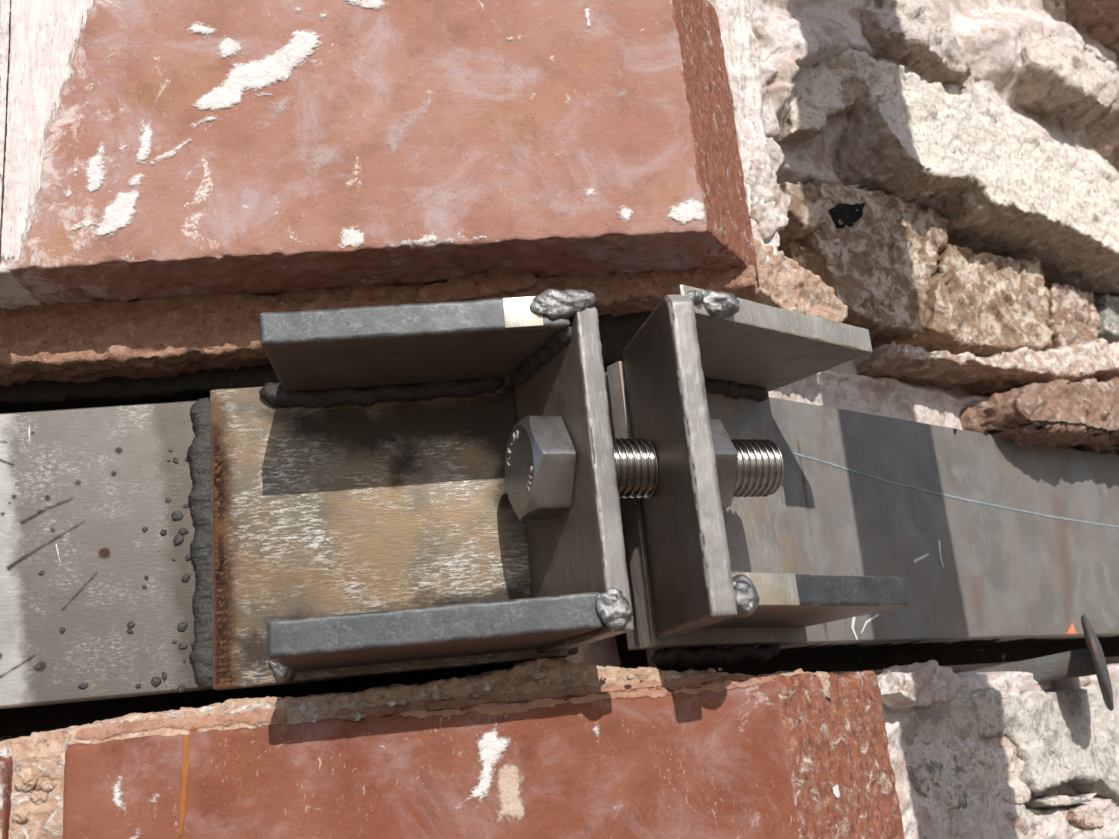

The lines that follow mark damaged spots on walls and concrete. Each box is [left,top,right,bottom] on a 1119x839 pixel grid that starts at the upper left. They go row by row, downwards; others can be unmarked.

peeling [345,0,386,9]
peeling [187,21,241,57]
peeling [286,32,319,70]
peeling [59,116,215,230]
rust [176,724,195,838]
peeling [494,764,525,822]